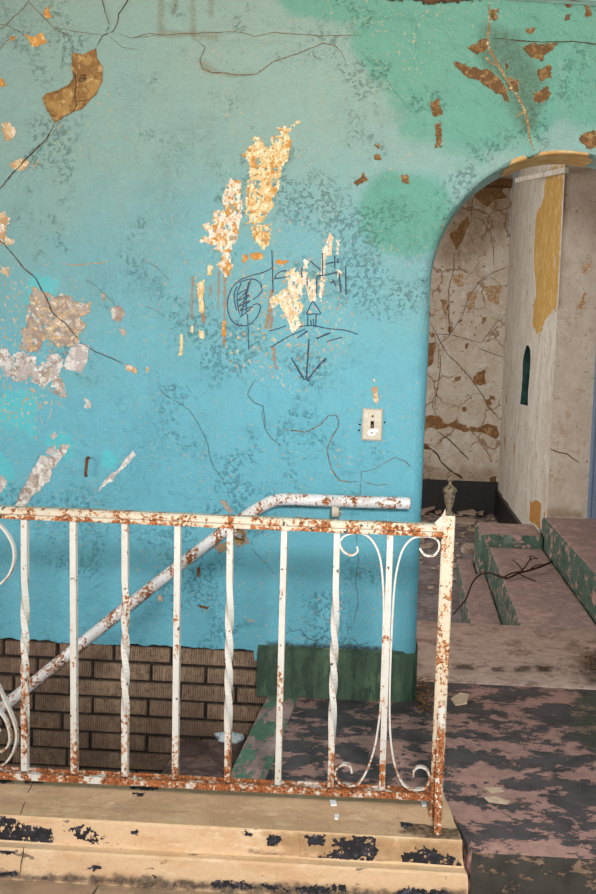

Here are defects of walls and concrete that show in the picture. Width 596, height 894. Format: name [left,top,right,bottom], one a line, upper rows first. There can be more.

crack [0,73,96,188]
spalling [41,47,104,124]
crack [0,0,362,76]
crack [485,3,596,150]
crack [0,241,121,363]
peeling [0,285,127,399]
peeling [196,120,301,313]
peeling [269,233,340,333]
crack [430,199,509,420]
peeling [500,129,596,337]
peeling [0,816,104,855]
peeling [304,834,379,861]